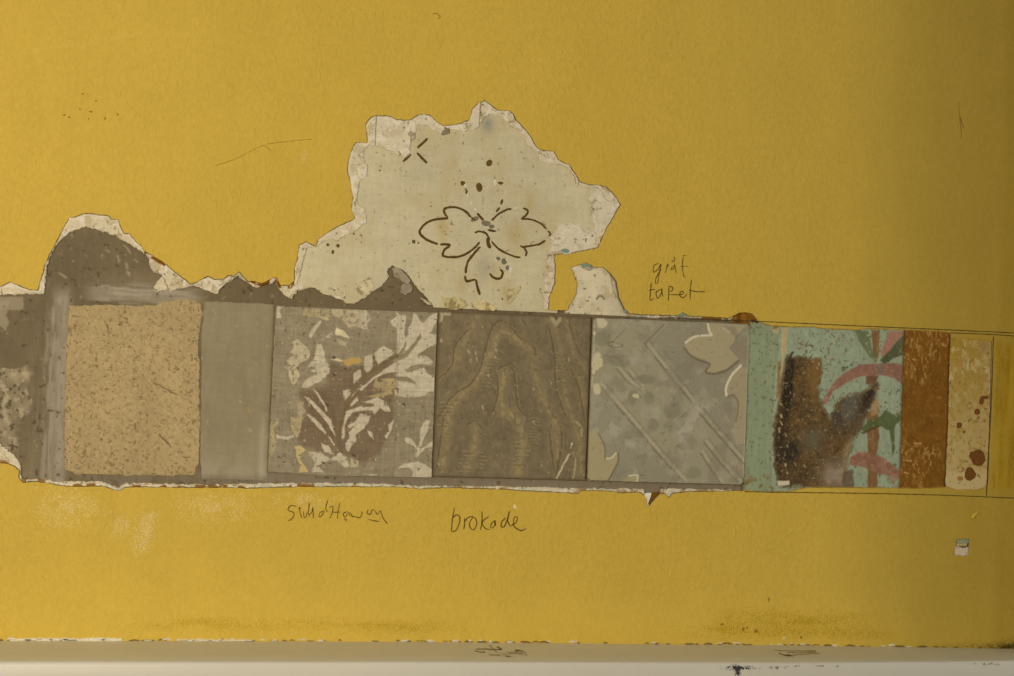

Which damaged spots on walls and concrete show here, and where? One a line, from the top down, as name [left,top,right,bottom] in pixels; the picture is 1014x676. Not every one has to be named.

peeling [0,100,752,505]